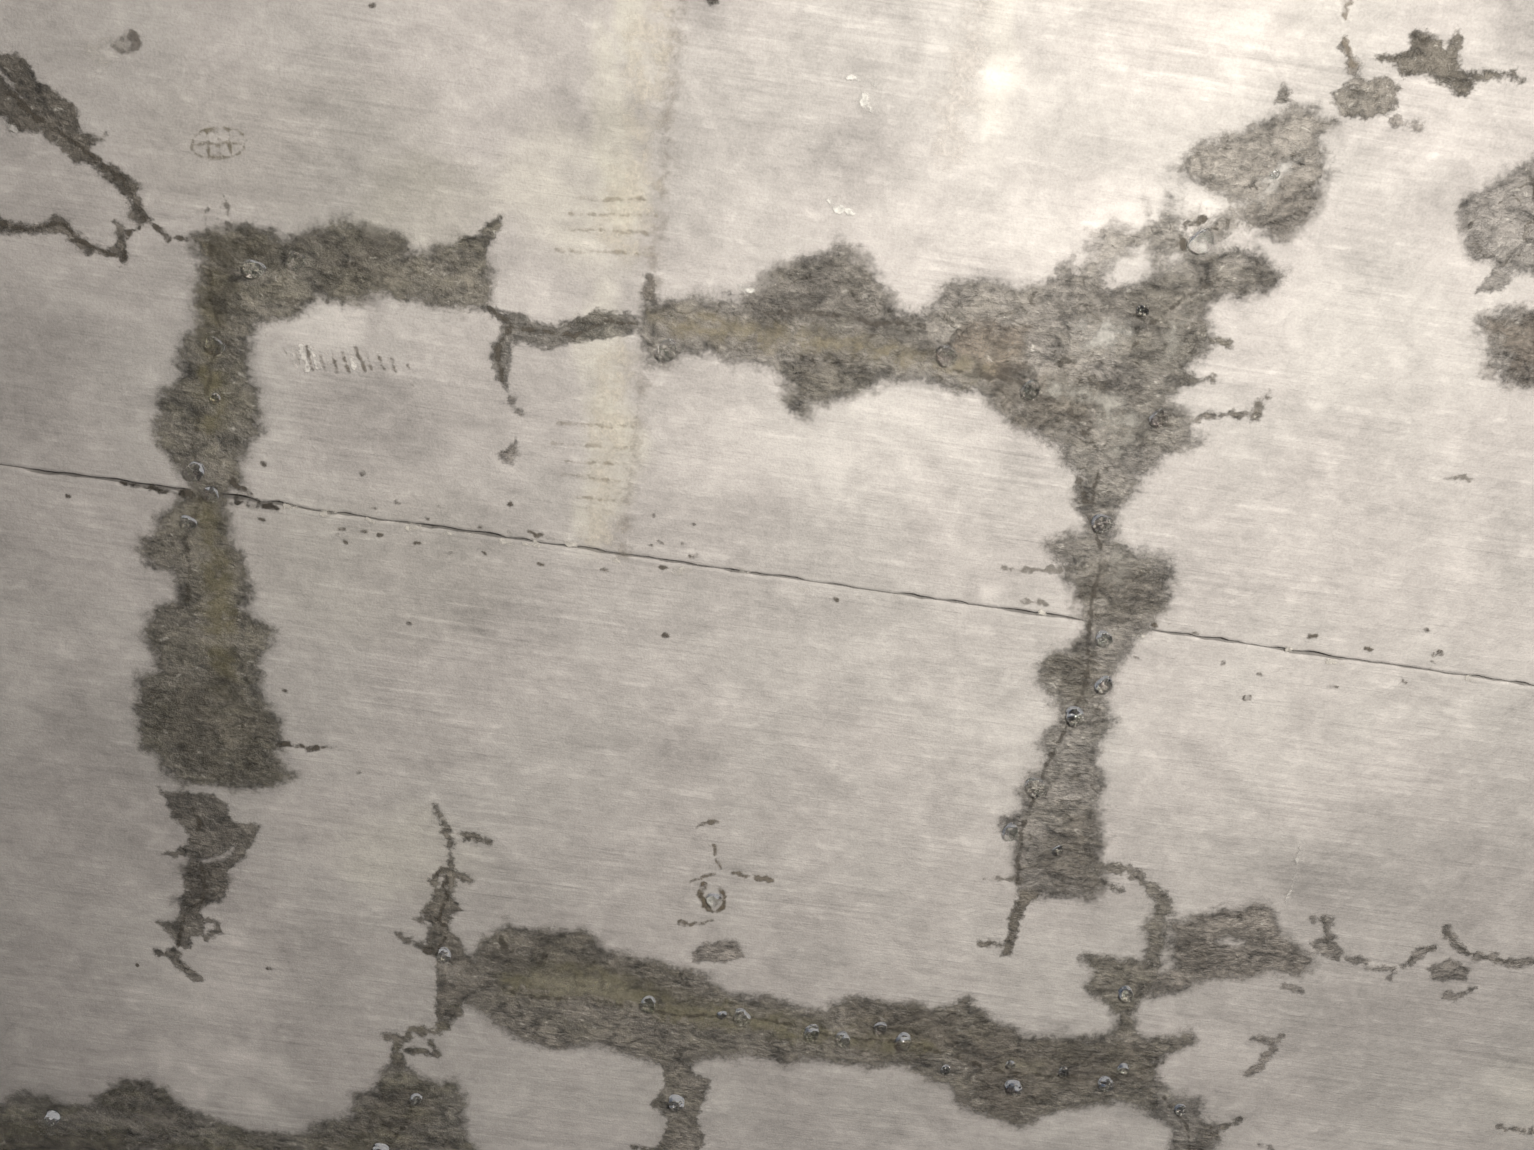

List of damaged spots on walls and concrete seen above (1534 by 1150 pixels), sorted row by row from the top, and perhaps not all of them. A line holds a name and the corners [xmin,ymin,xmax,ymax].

water stain [846,75,875,112]
water stain [1332,43,1403,128]
water stain [1377,30,1526,97]
crack [0,53,187,264]
water stain [1179,86,1338,244]
water stain [1459,160,1534,294]
water stain [1480,307,1534,388]
water stain [0,203,1312,1150]
crack [1310,915,1534,1000]